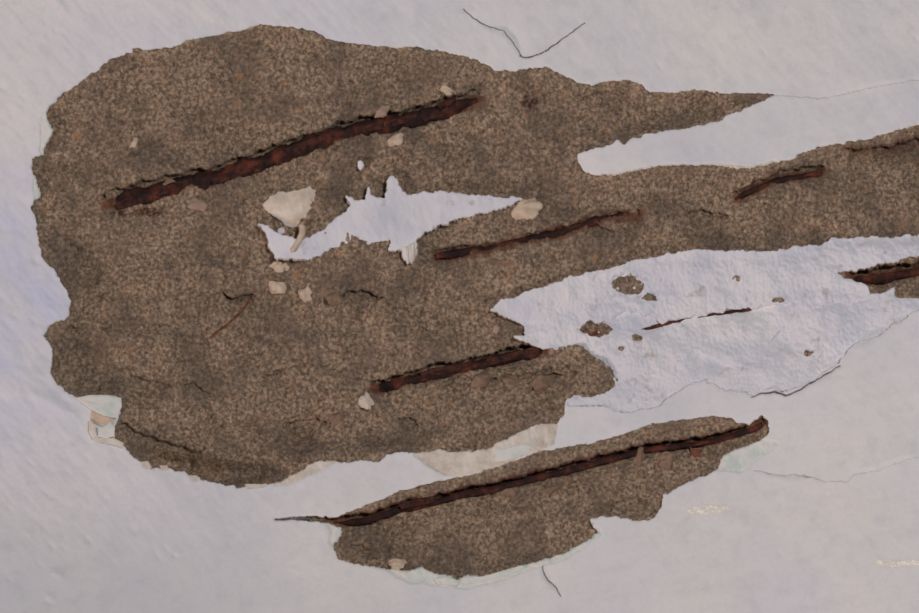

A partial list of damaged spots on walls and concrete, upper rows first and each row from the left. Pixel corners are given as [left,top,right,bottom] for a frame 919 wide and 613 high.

crack [463,9,585,58]
spalling [31,24,919,490]
spalling [303,415,778,589]